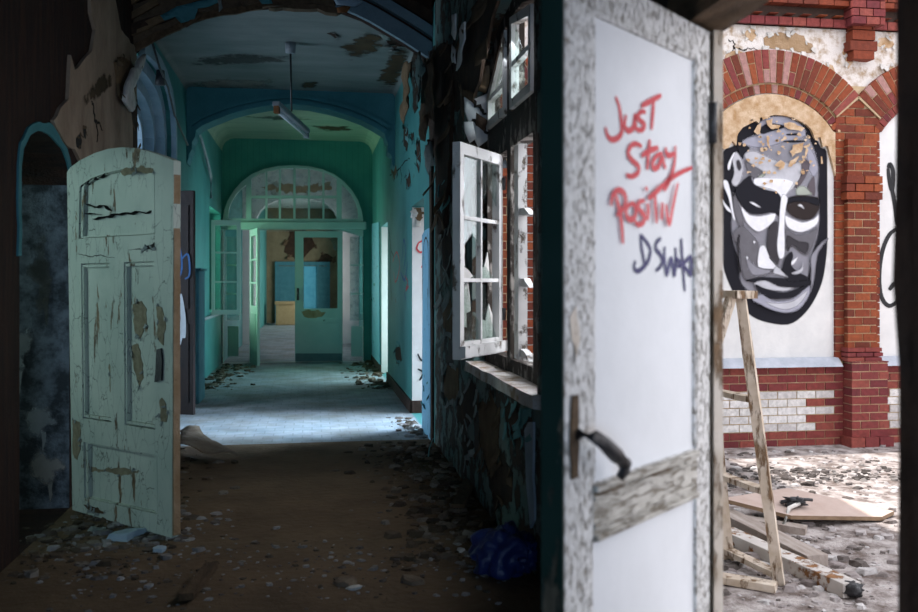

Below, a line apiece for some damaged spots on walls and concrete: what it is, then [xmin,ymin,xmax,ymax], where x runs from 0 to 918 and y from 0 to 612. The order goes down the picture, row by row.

spalling [50,0,362,161]
spalling [725,25,816,58]
spalling [875,35,896,51]
spalling [378,0,500,351]
peeling [723,94,841,194]
damp [19,331,30,393]
damp [27,409,65,501]
peeling [440,362,478,473]
peeling [502,398,532,450]